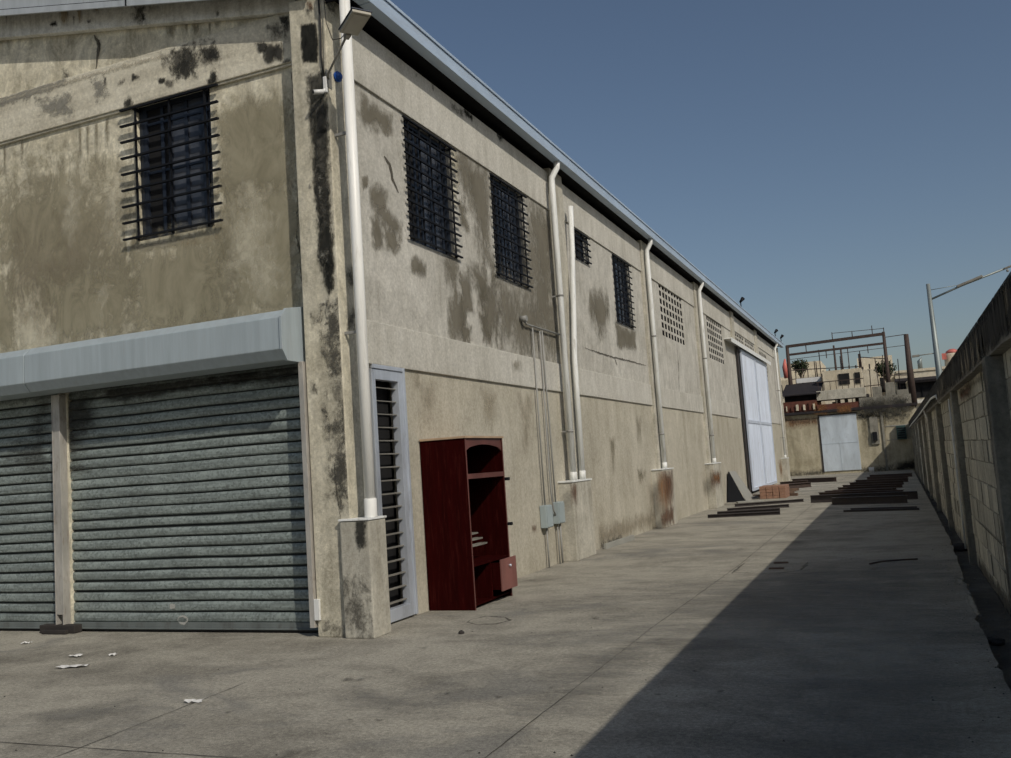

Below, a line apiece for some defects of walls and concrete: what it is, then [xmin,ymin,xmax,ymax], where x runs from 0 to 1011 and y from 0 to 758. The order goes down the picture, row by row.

water stain [158,41,219,86]
water stain [255,16,290,63]
water stain [361,96,392,136]
water stain [363,176,401,253]
water stain [301,2,355,510]
water stain [445,152,559,361]
water stain [857,272,1011,472]
water stain [355,521,366,548]
water stain [324,580,371,638]